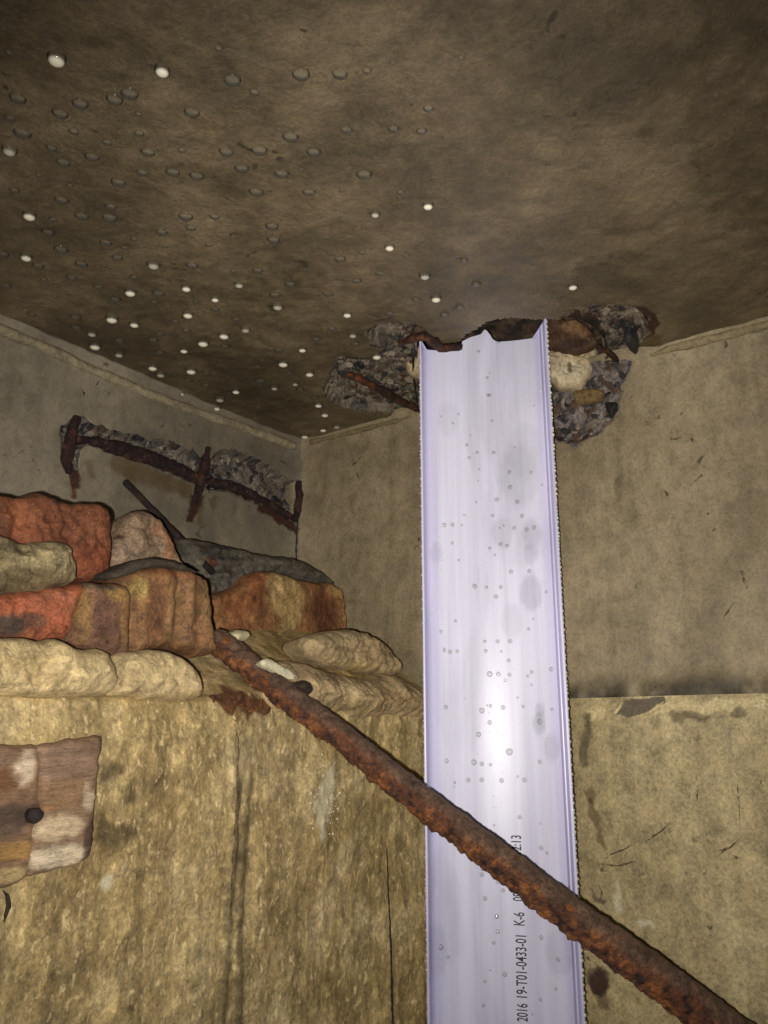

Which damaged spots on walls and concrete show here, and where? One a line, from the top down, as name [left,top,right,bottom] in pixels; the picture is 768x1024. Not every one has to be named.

corrosion [638,307,660,347]
spalling [322,322,462,418]
spalling [551,303,651,449]
corrosion [69,470,79,499]
spalling [60,415,304,526]
corrosion [187,496,215,522]
corrosion [257,505,297,533]
corrosion [209,685,271,718]
crack [600,822,670,899]
corrosion [588,953,609,997]